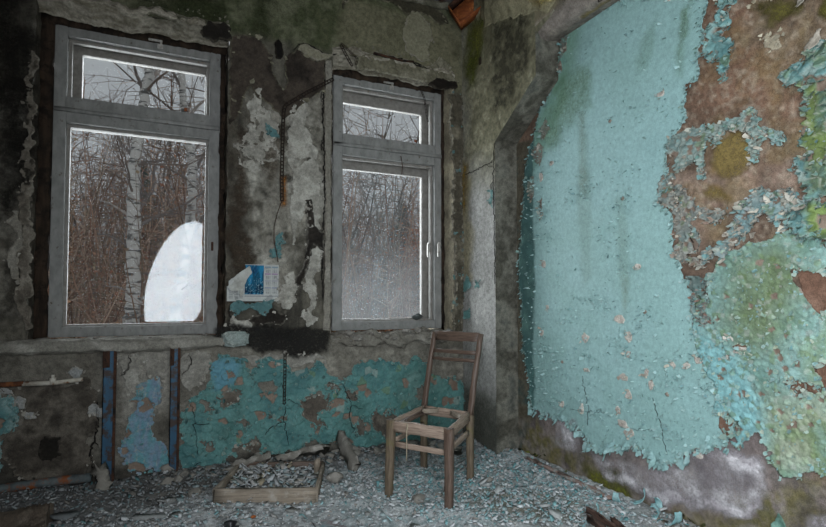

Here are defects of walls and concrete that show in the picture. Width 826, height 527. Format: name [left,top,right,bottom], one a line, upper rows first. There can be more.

damp [491,14,528,107]
spalling [2,50,40,330]
spalling [38,0,481,332]
peeling [516,0,826,481]
spalling [0,366,102,481]
peeling [117,353,169,476]
crack [265,385,301,445]
peeling [179,350,466,469]
efflorescence [599,450,763,518]
peeling [771,513,786,527]